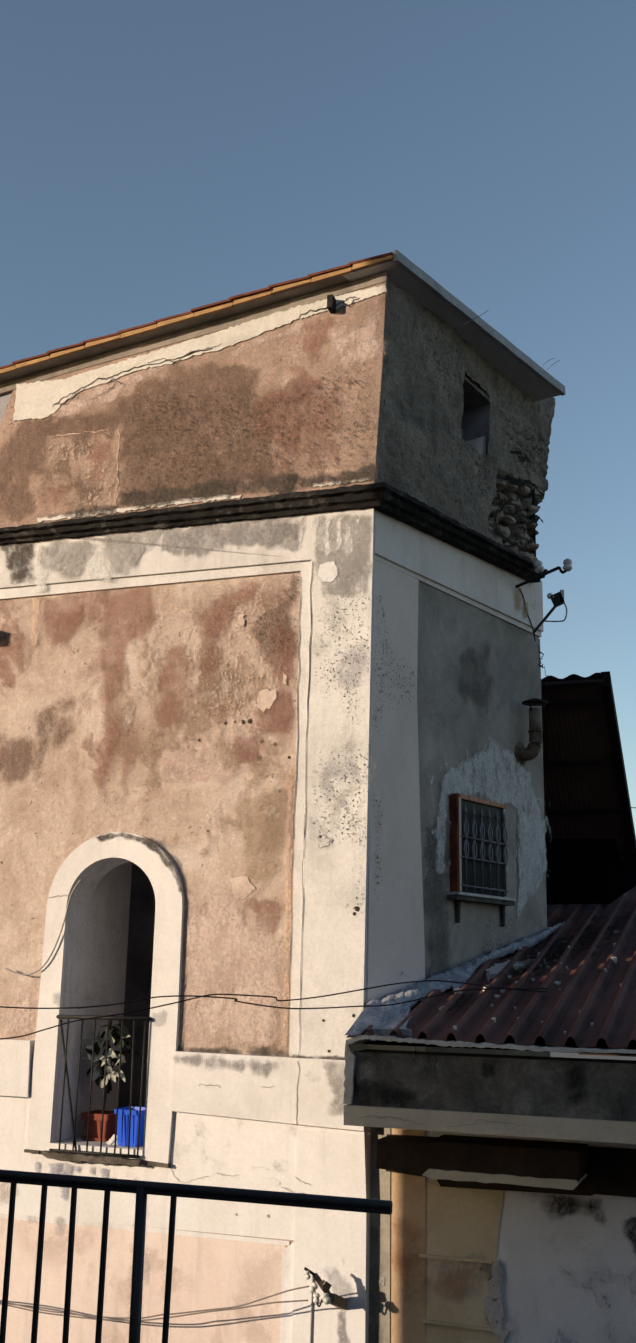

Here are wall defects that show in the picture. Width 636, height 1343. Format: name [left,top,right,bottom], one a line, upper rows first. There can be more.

crack [299,296,360,317]
leakage [0,321,381,520]
spalling [488,478,544,563]
leakage [176,996,373,1114]